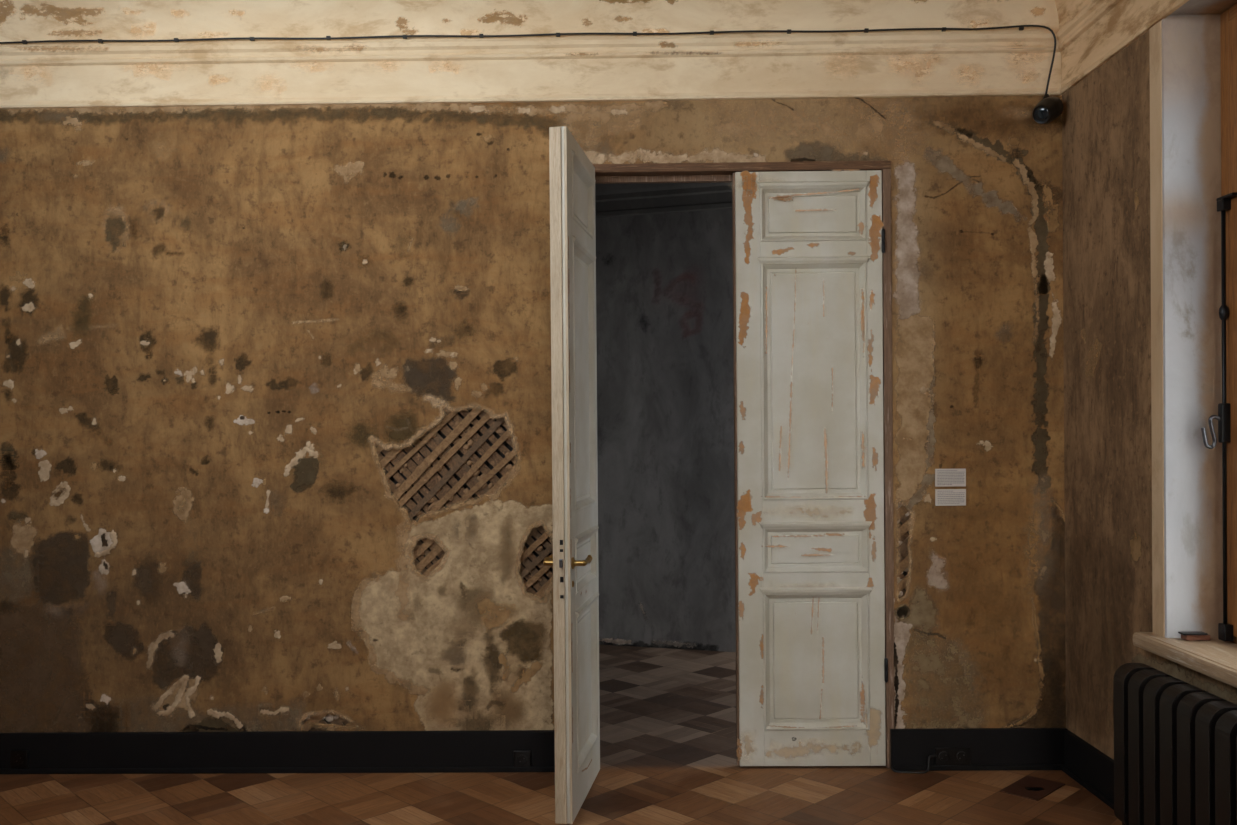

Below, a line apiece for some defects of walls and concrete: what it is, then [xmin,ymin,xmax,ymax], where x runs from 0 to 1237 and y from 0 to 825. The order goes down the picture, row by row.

peeling [0,0,101,51]
peeling [600,0,651,22]
peeling [645,29,718,55]
crack [924,176,980,199]
peeling [738,292,750,347]
flaking render [740,162,936,503]
damp [355,345,518,404]
damp [0,494,303,733]
flaking render [328,500,554,731]